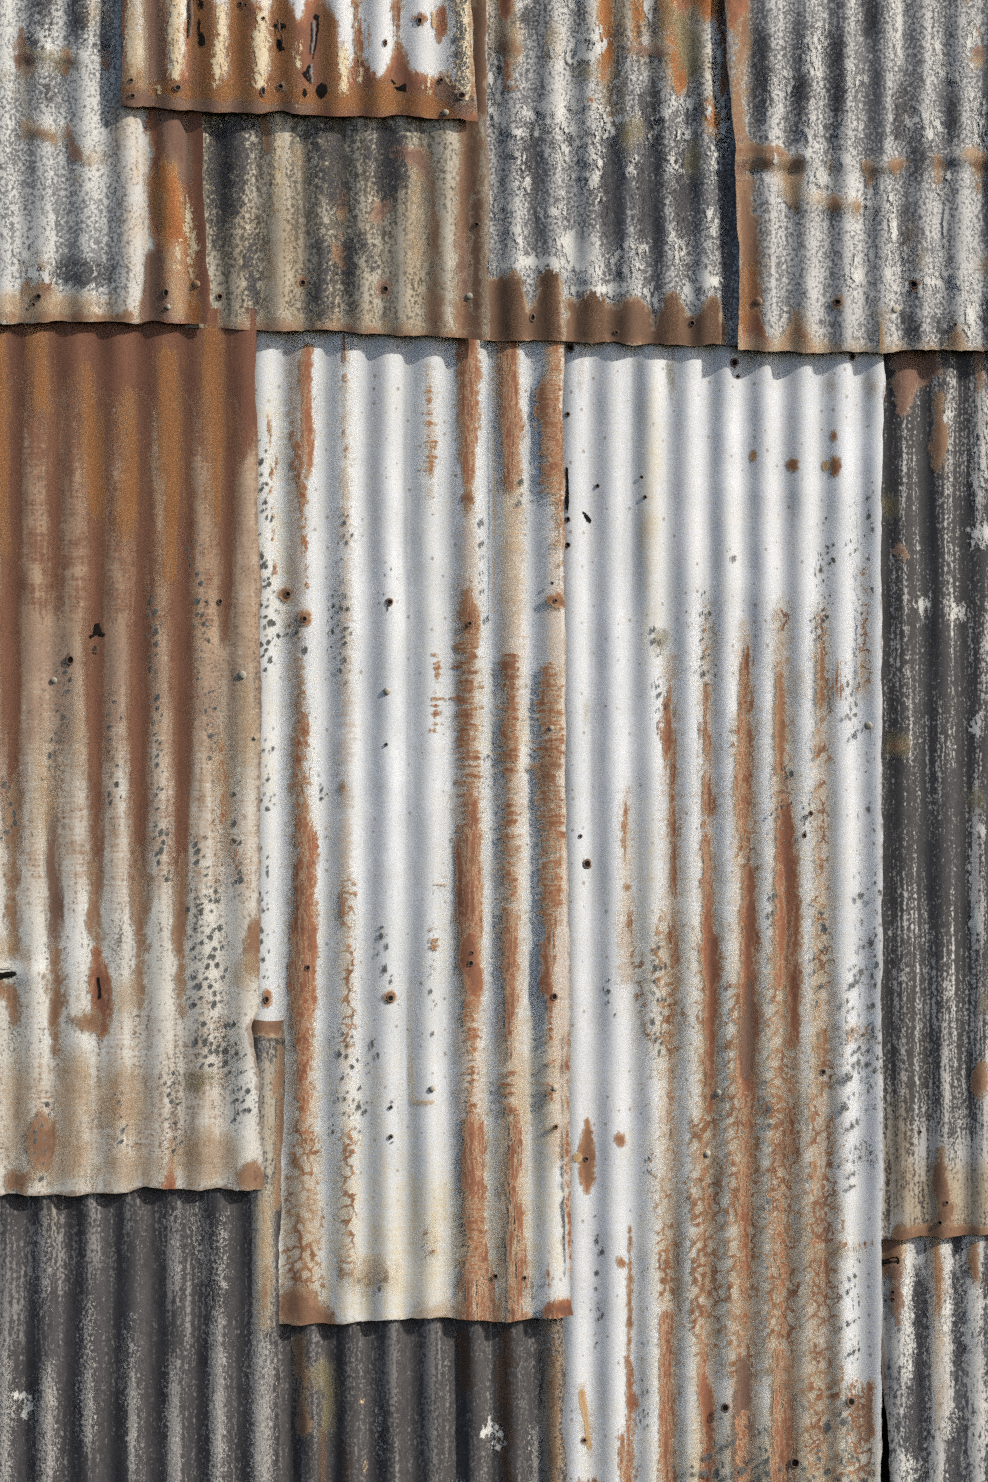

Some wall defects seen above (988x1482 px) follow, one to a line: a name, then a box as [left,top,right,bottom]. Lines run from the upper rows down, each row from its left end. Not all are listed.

rust [828,157,911,216]
rust [965,146,988,193]
rust [0,0,818,1058]
rust [822,429,842,477]
rust [879,321,986,473]
rust [4,1110,61,1195]
rust [162,1137,176,1189]
rust [235,657,359,1482]
rust [425,576,602,1482]
rust [614,1132,626,1147]
rust [622,566,988,1482]
rust [616,1226,641,1482]